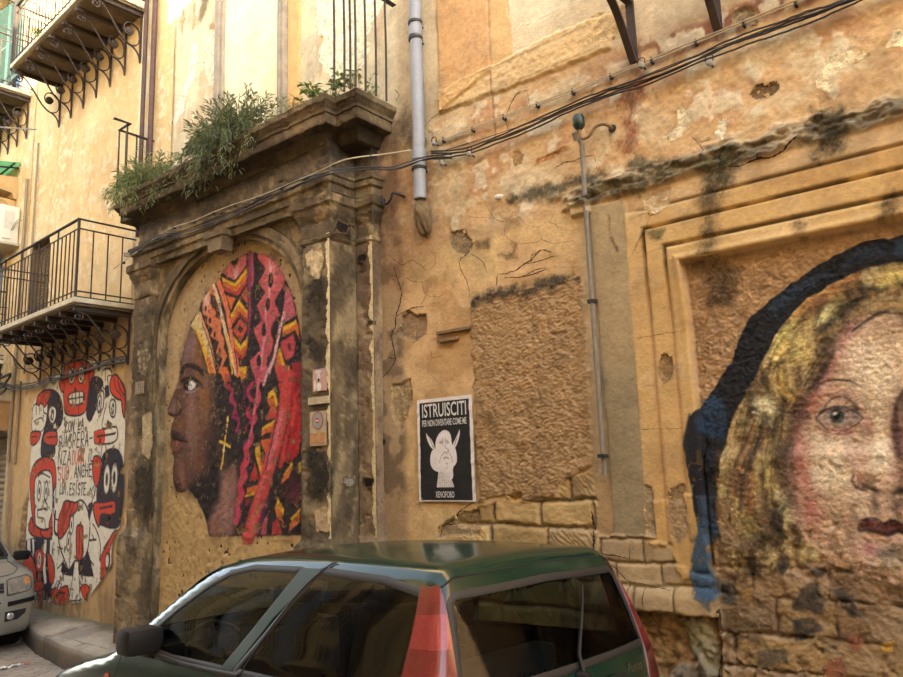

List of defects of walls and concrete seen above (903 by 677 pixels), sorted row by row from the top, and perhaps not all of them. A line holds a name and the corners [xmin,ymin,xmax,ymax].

flaking render [881,28,903,48]
flaking render [816,50,871,93]
flaking render [750,81,780,99]
flaking render [662,106,693,142]
flaking render [715,118,727,140]
flaking render [449,229,474,256]
crack [382,209,572,377]
flaking render [399,311,427,343]
flaking render [438,507,483,538]
flaking render [643,484,656,538]
flaking render [666,483,689,544]